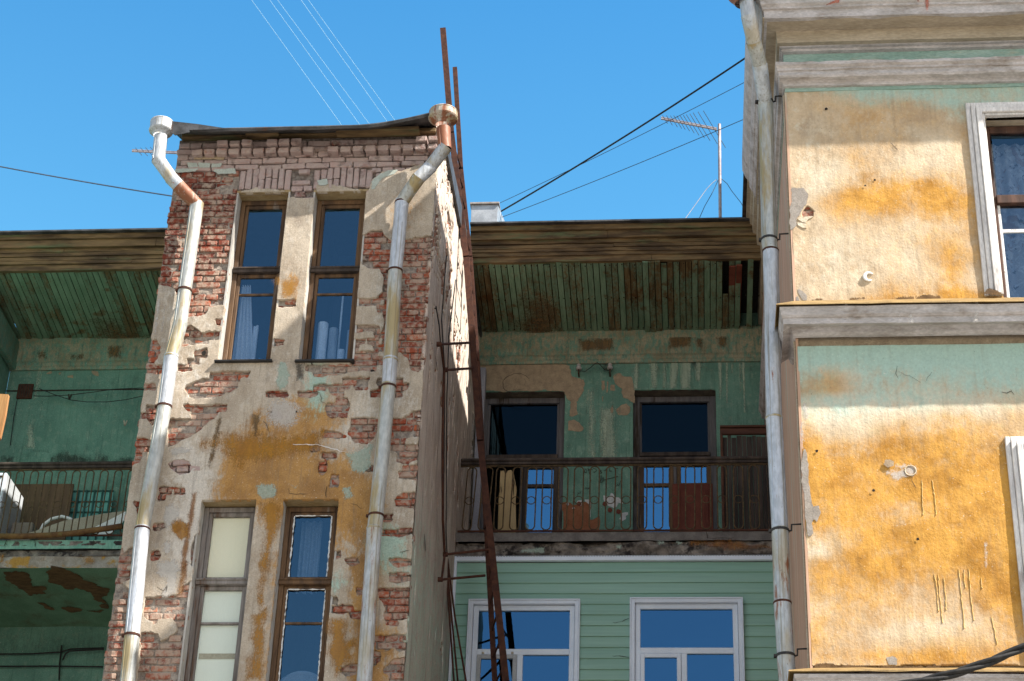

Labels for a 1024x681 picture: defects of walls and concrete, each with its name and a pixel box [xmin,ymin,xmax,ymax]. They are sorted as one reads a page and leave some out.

flaking render [156,191,189,295]
flaking render [168,136,438,447]
flaking render [789,187,814,230]
flaking render [132,403,157,466]
flaking render [144,339,163,391]
flaking render [157,460,200,501]
water stain [171,399,325,470]
flaking render [266,232,391,499]
peeling [601,373,635,415]
flaking render [801,403,821,536]
flaking render [0,547,133,681]
flaking render [373,558,412,681]